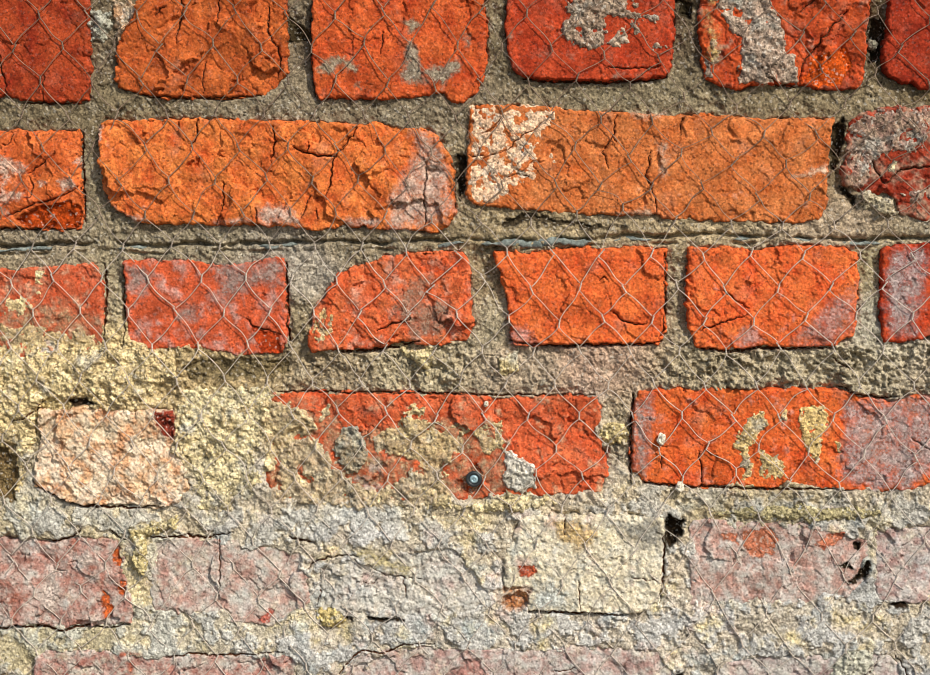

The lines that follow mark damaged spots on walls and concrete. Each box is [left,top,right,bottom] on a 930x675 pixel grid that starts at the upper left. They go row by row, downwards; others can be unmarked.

crack [155,0,184,39]
crack [267,7,282,74]
crack [142,62,261,100]
crack [271,126,357,219]
crack [468,123,541,158]
water stain [465,104,562,207]
crack [601,115,617,169]
peeling [319,403,331,422]
peeling [372,435,389,455]
peeling [471,420,505,455]
flaking render [733,410,787,481]
flaking render [780,405,830,464]